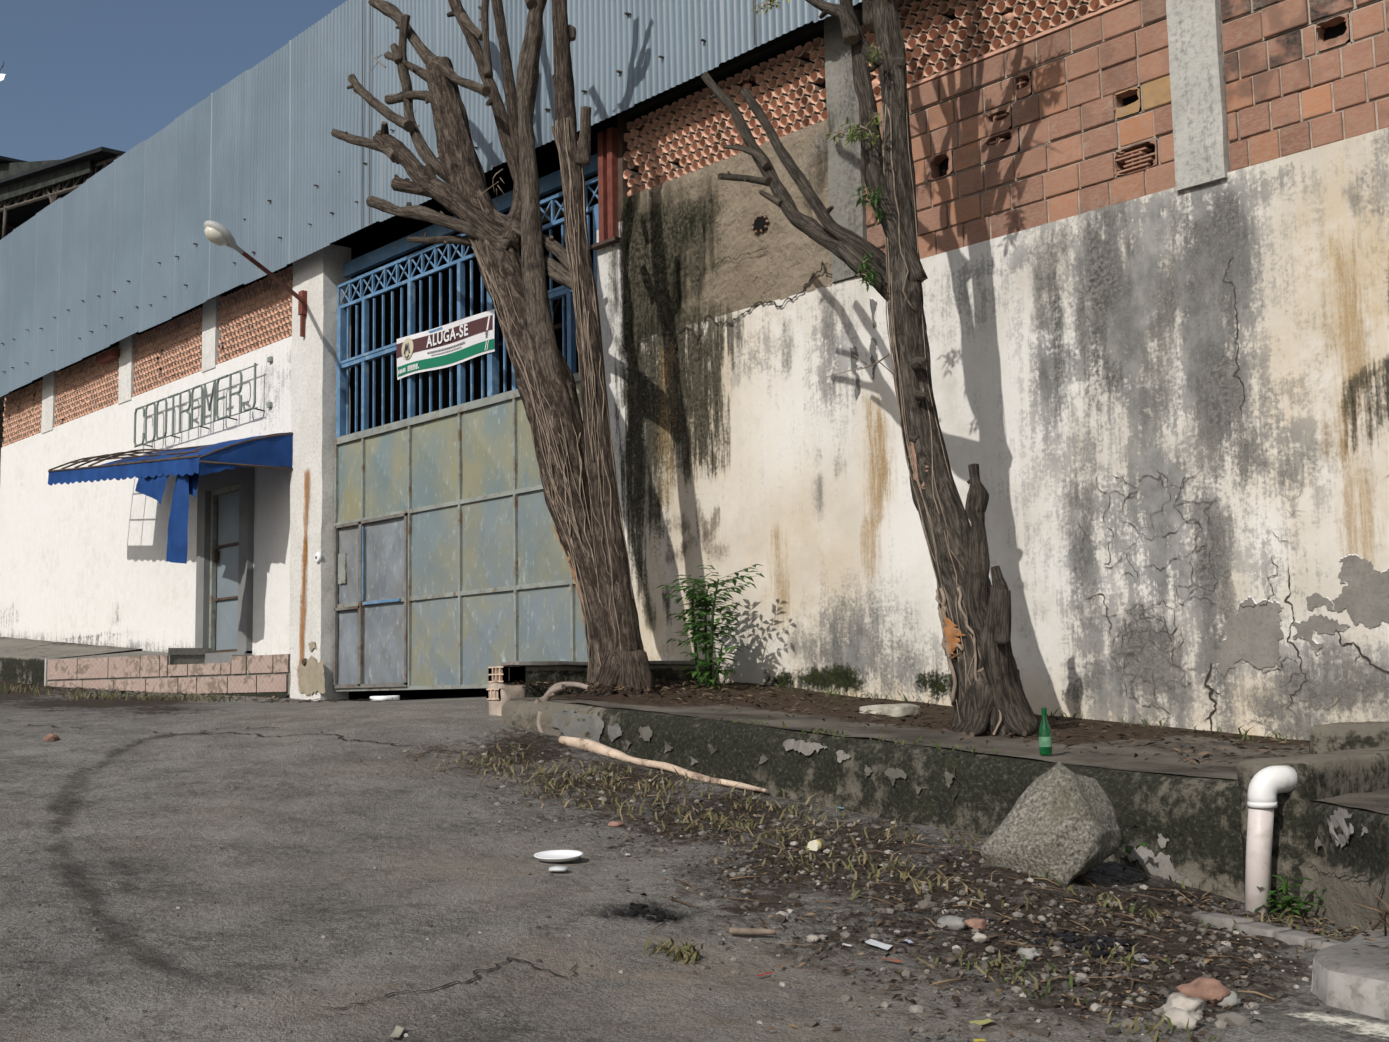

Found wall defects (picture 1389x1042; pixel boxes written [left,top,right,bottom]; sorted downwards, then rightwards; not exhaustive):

leakage [1034,232,1066,332]
leakage [1140,254,1177,408]
leakage [611,183,742,628]
leakage [1344,358,1389,450]
corrosion [298,471,310,687]
leakage [1064,472,1096,621]
crack [1077,443,1389,731]
peeling [1210,554,1389,676]
crack [137,727,412,746]
peeling [1314,807,1368,852]
crack [328,957,578,1008]